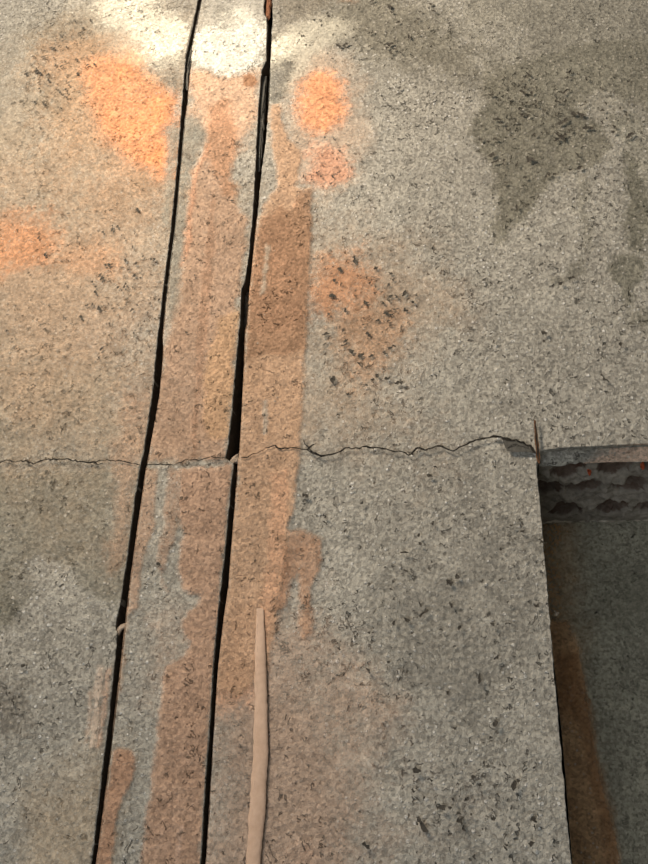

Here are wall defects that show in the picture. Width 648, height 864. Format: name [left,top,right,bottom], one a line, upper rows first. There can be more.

efflorescence [101,0,305,97]
water stain [471,40,648,243]
water stain [611,153,648,299]
corrosion [130,470,155,607]
corrosion [141,72,347,864]
crack [0,435,502,465]
corrosion [96,749,133,864]
corrosion [550,623,618,864]